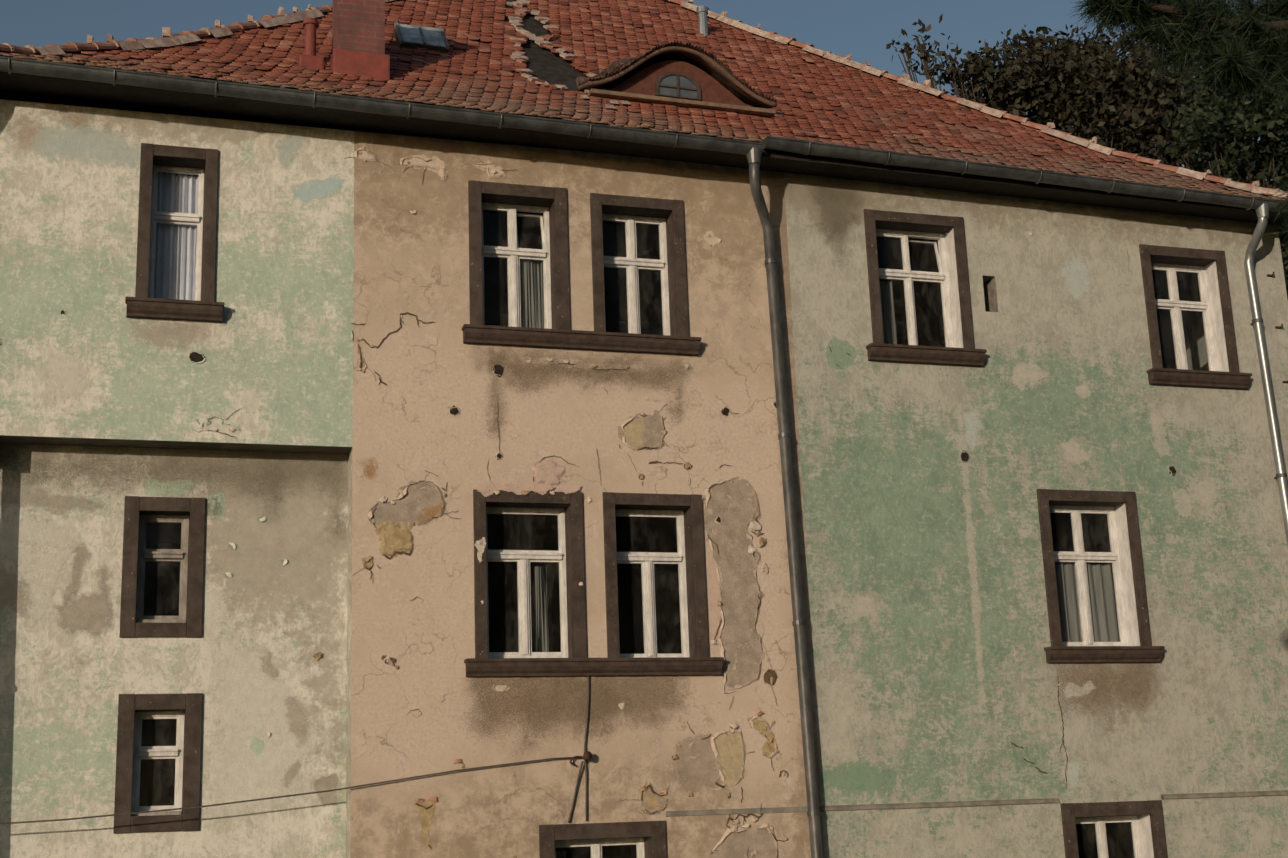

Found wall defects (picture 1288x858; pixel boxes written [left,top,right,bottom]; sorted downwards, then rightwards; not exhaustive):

crack [351,312,433,385]
spalling [618,403,670,451]
spalling [351,470,461,584]
peeling [702,477,778,694]
water stain [455,676,697,758]
spalling [618,711,788,858]
crack [1011,669,1068,788]
water stain [1050,663,1163,731]